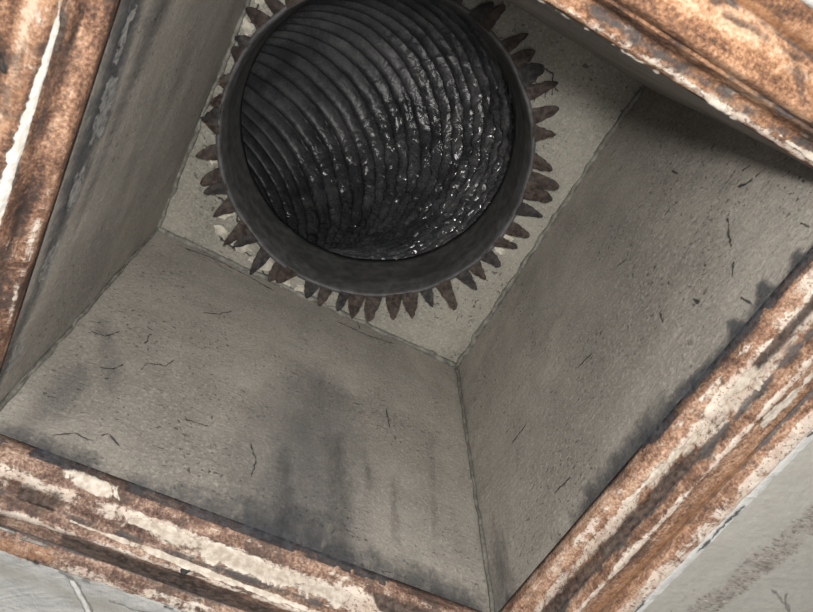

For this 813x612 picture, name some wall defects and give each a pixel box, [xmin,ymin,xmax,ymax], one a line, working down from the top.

rust [54,7,69,47]
peeling [0,2,60,224]
rust [754,296,813,368]
leakage [583,248,813,513]
peeling [760,371,813,428]
leakage [0,431,86,472]
peeling [64,469,120,501]
peeling [622,423,706,506]
peeling [70,518,351,612]
leakage [153,498,320,557]
leakage [320,548,475,608]
rust [541,452,698,612]